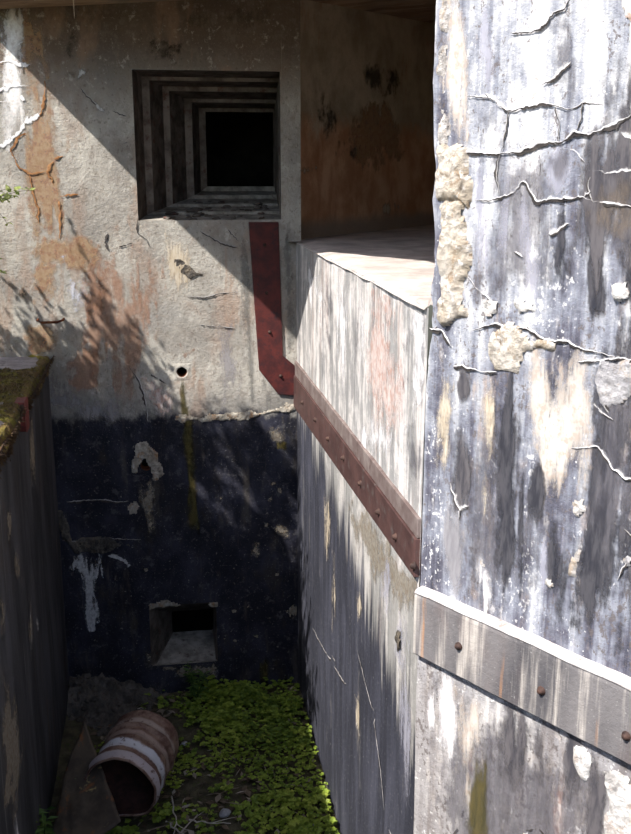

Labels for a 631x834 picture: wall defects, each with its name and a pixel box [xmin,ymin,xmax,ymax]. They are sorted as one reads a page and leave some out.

crack [510,0,569,34]
corrosion [21,19,49,79]
crack [466,62,631,208]
damp [477,148,567,289]
corrosion [25,106,152,392]
crack [474,322,631,364]
damp [602,326,631,364]
spalling [131,441,164,481]
damp [444,348,631,628]
crack [571,446,631,481]
peeling [573,745,594,782]
peeling [602,770,631,834]